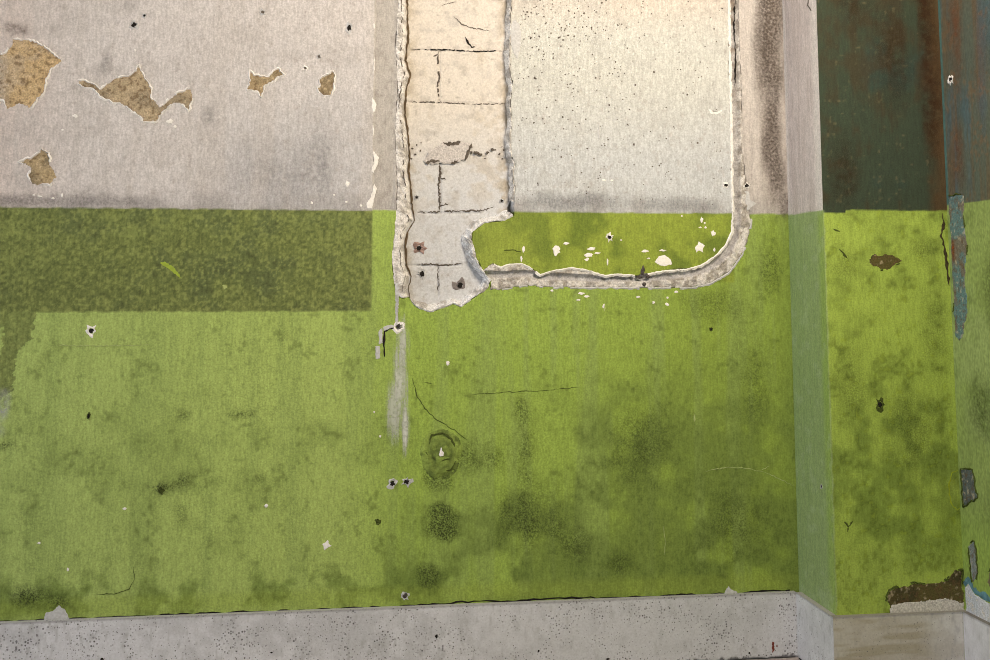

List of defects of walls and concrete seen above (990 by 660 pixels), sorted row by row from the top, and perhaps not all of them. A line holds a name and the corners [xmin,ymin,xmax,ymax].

peeling [0,37,62,110]
peeling [77,64,193,128]
peeling [246,67,286,98]
peeling [18,148,63,199]
spalling [375,0,756,359]
leakage [762,104,784,190]
peeling [869,254,902,271]
crack [940,214,950,285]
peeling [948,193,968,340]
leakage [389,329,408,446]
leakage [429,504,457,540]
peeling [885,540,990,622]